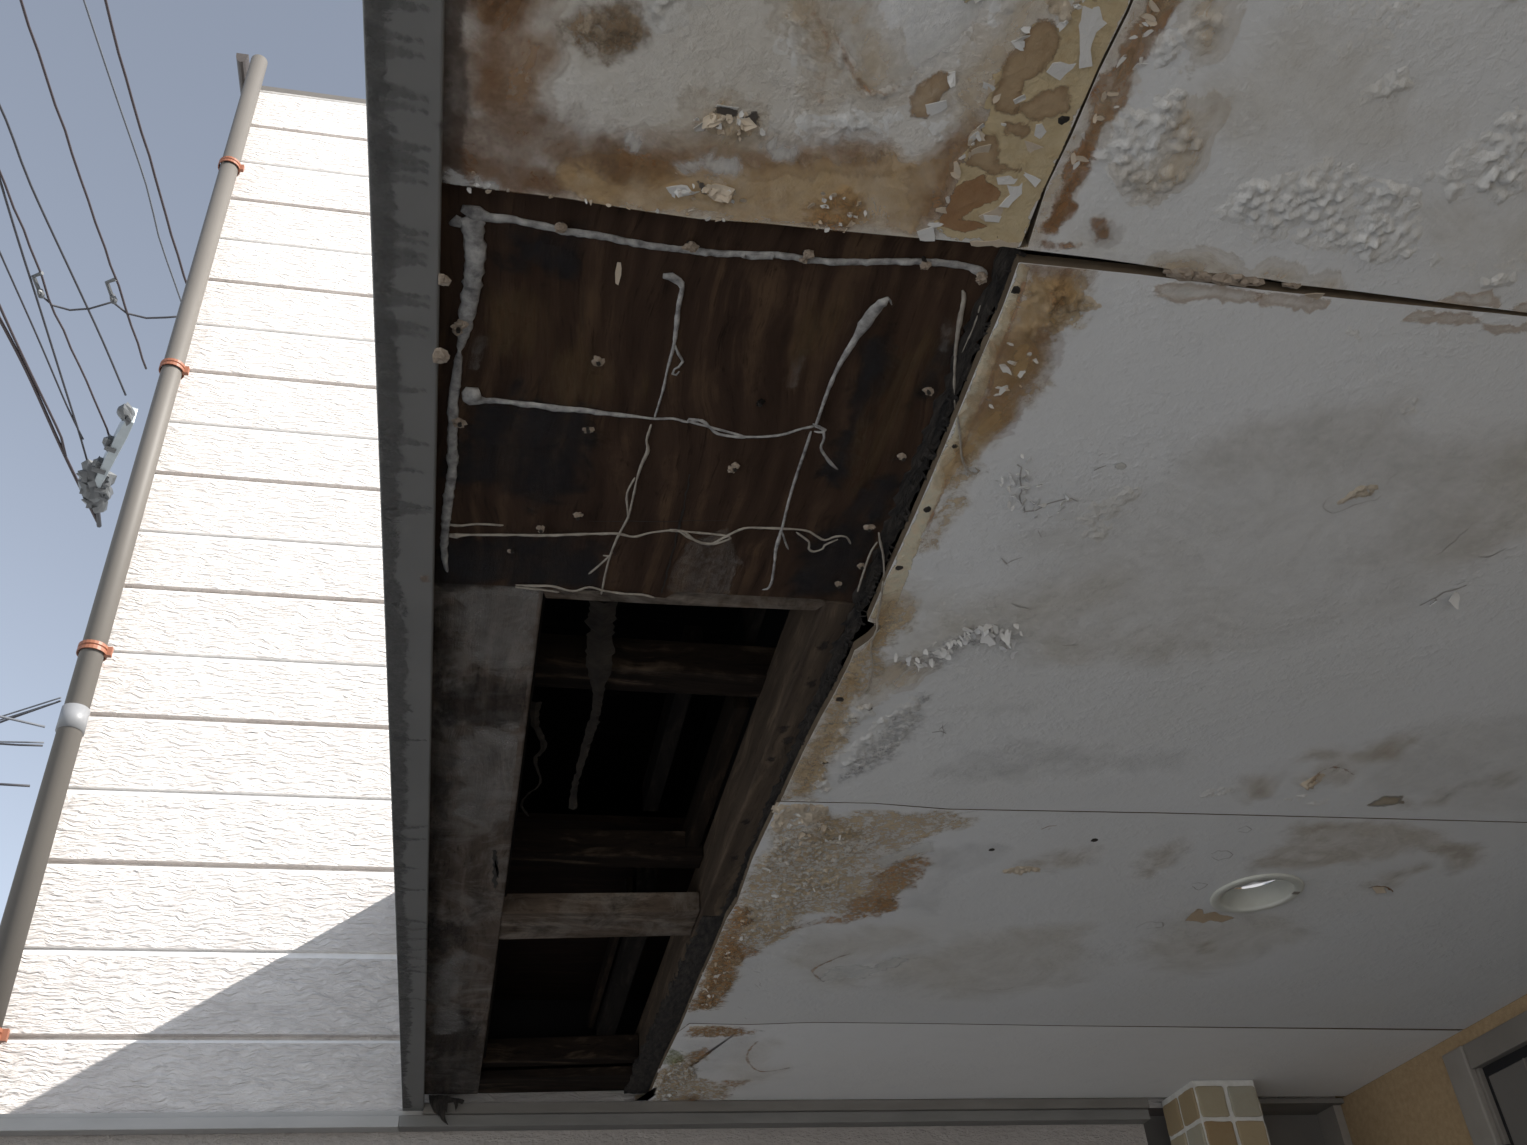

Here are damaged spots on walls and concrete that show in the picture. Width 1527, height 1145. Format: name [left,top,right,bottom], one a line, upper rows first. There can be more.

leakage [442,0,976,234]
leakage [817,336,954,487]
peeling [871,0,1128,619]
leakage [926,272,1092,548]
leakage [655,601,1023,1101]
peeling [1186,909,1233,923]